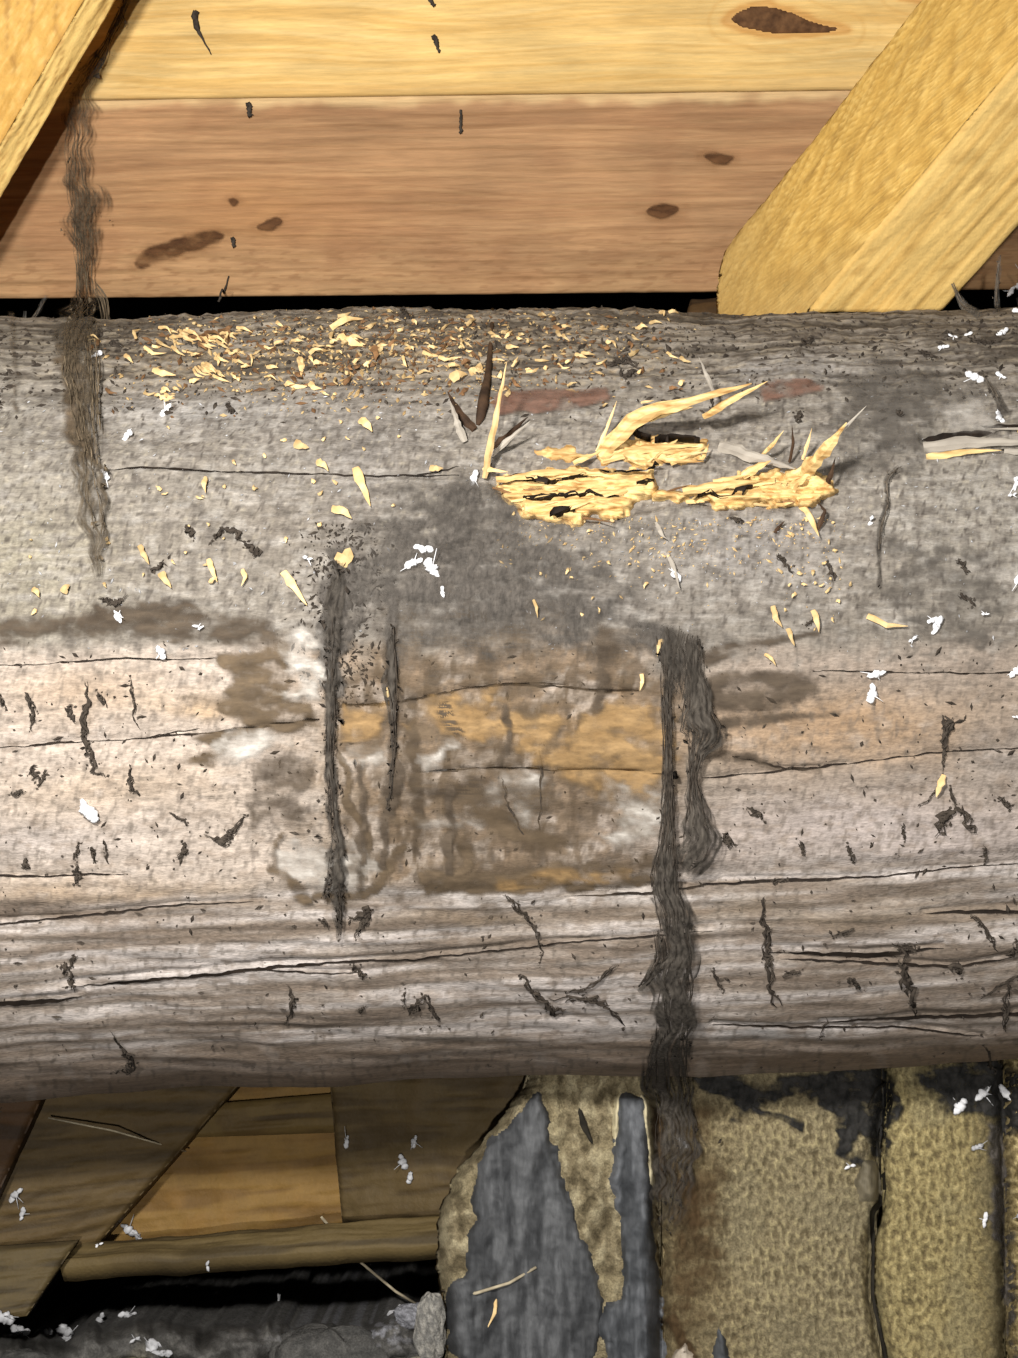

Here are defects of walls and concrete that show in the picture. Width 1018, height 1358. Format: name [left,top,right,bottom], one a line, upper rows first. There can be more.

spalling [448,358,866,536]
spalling [655,522,680,589]
damp [703,632,839,728]
damp [0,550,682,905]
damp [706,752,779,770]
crack [0,901,253,925]
crack [575,863,1018,896]
crack [0,931,708,1006]
crack [770,948,1012,968]
peeling [612,1092,622,1146]
peeling [640,1094,655,1186]
damp [751,1106,804,1132]